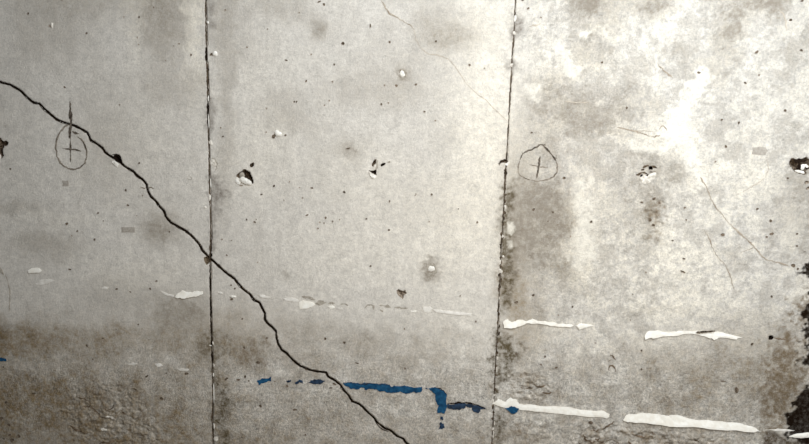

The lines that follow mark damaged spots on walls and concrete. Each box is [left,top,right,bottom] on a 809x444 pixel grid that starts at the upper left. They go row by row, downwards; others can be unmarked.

crack [381,0,504,118]
hole [235,163,254,186]
spalling [636,165,670,246]
hole [789,157,809,190]
crack [0,81,409,444]
water stain [145,290,216,339]
water stain [791,250,809,368]
water stain [762,378,809,444]